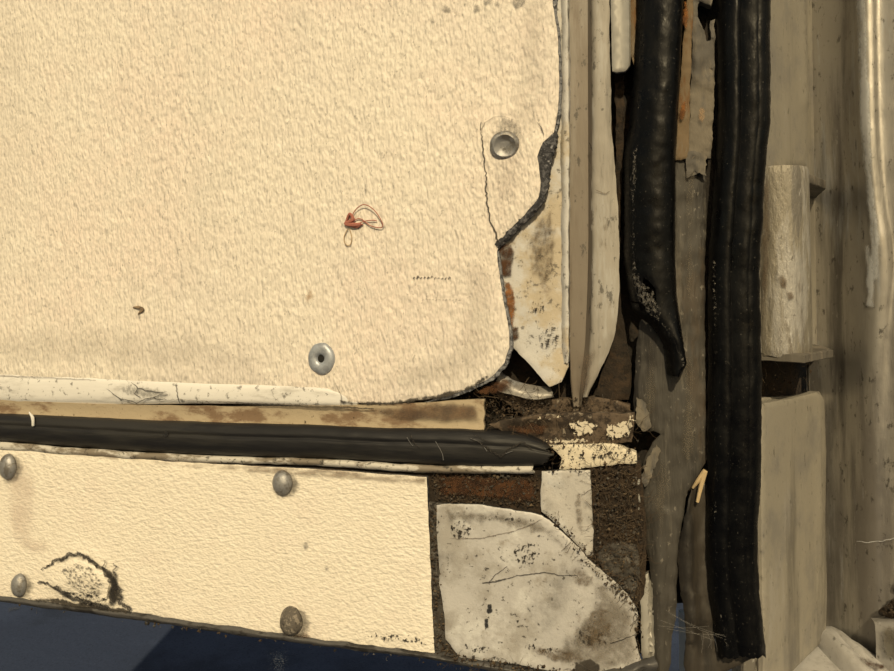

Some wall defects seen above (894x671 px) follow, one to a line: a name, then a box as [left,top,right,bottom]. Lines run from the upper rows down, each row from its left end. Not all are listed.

crack [480,123,499,243]
corrosion [499,245,518,340]
water stain [534,223,554,281]
peeling [546,415,635,445]